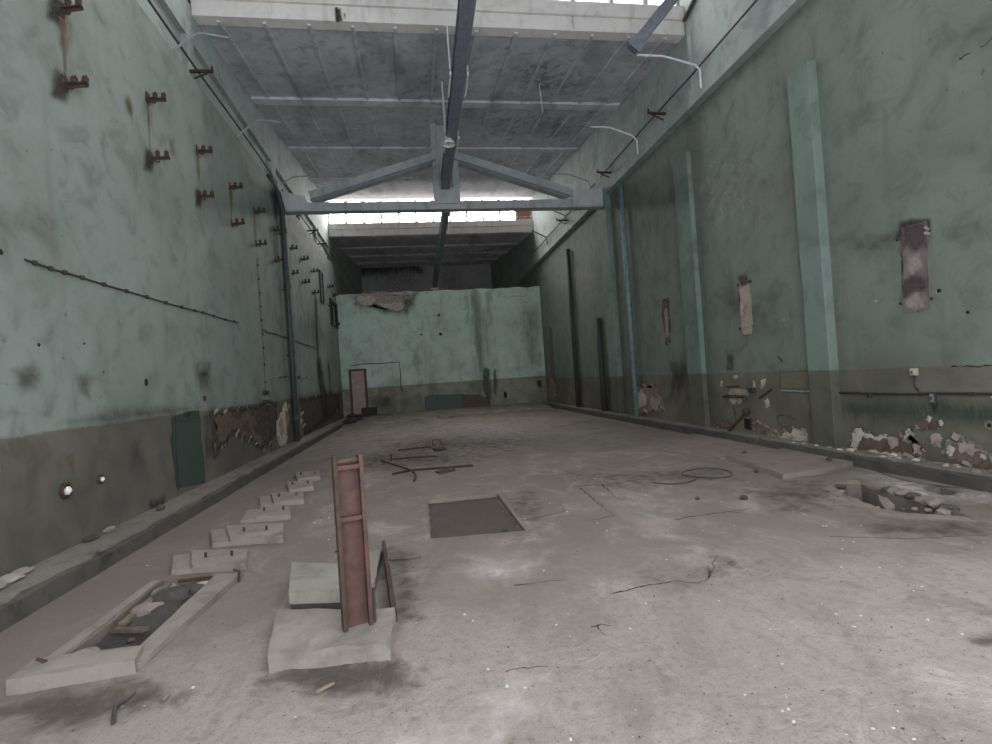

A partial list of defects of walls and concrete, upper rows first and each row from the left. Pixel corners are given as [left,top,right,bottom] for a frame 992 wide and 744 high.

flaking render [354,290,415,312]
flaking render [633,380,665,414]
flaking render [720,374,770,408]
flaking render [212,391,339,459]
flaking render [752,420,808,441]
flaking render [850,415,992,471]